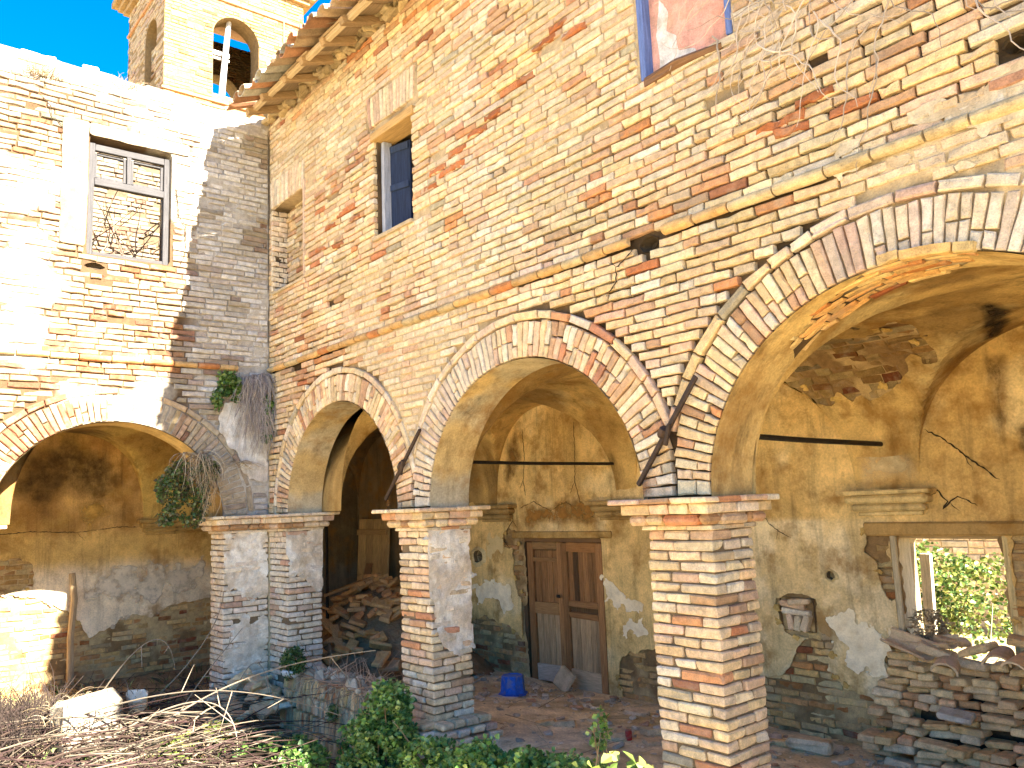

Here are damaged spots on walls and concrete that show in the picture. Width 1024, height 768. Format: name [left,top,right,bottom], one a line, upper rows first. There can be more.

flaking render [785,241,979,406]
crack [502,425,584,546]
crack [932,490,975,509]
crack [924,429,997,479]
flaking render [0,532,269,699]
peeling [286,529,323,592]
peeling [422,527,531,678]
peeling [599,574,648,639]
flaking render [860,527,907,614]
flaking render [615,649,662,704]
flaking render [763,593,921,745]